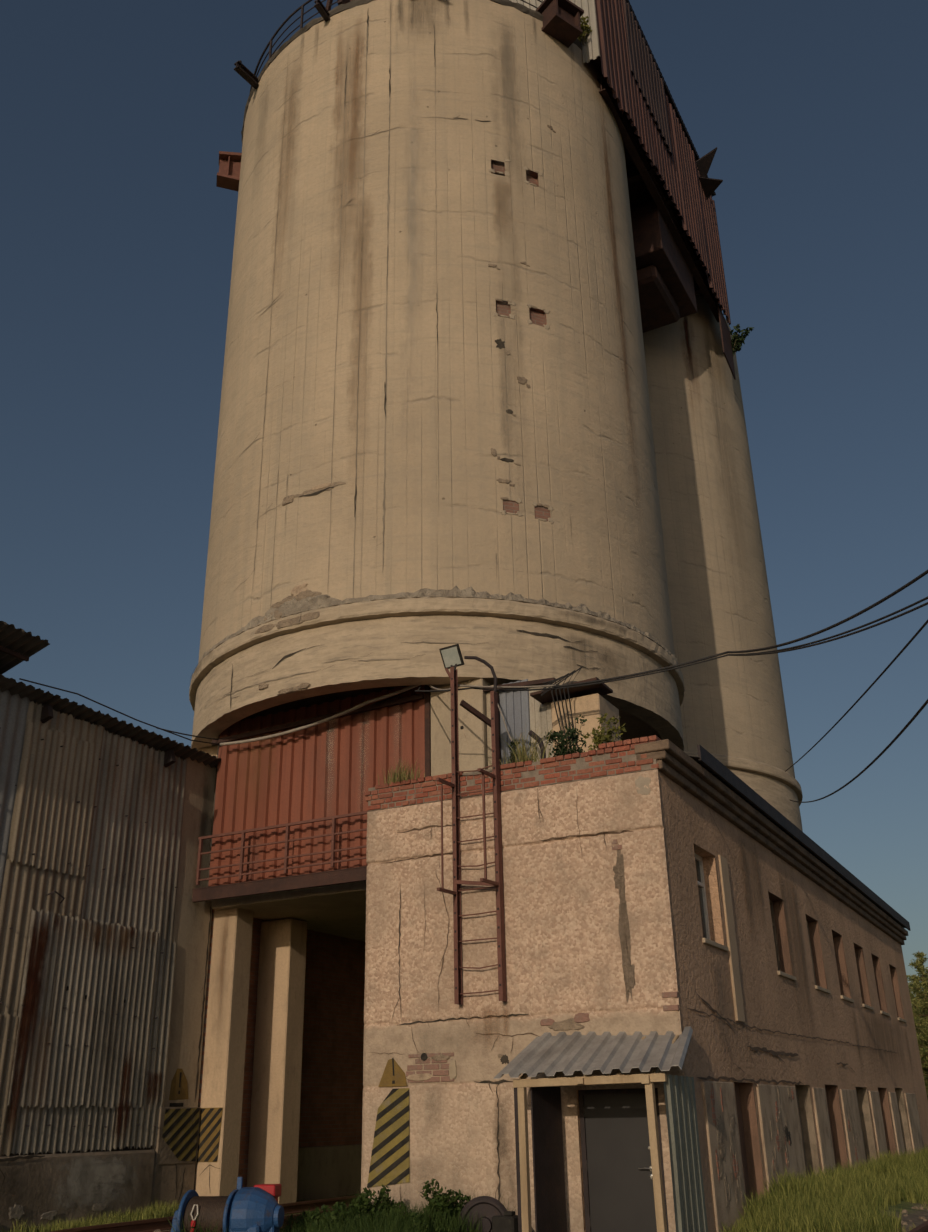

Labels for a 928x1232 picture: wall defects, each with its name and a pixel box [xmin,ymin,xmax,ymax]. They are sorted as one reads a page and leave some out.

spalling [264,582,330,624]
corrosion [9,916,60,1126]
corrosion [116,1059,131,1135]
flaking render [406,1052,457,1083]